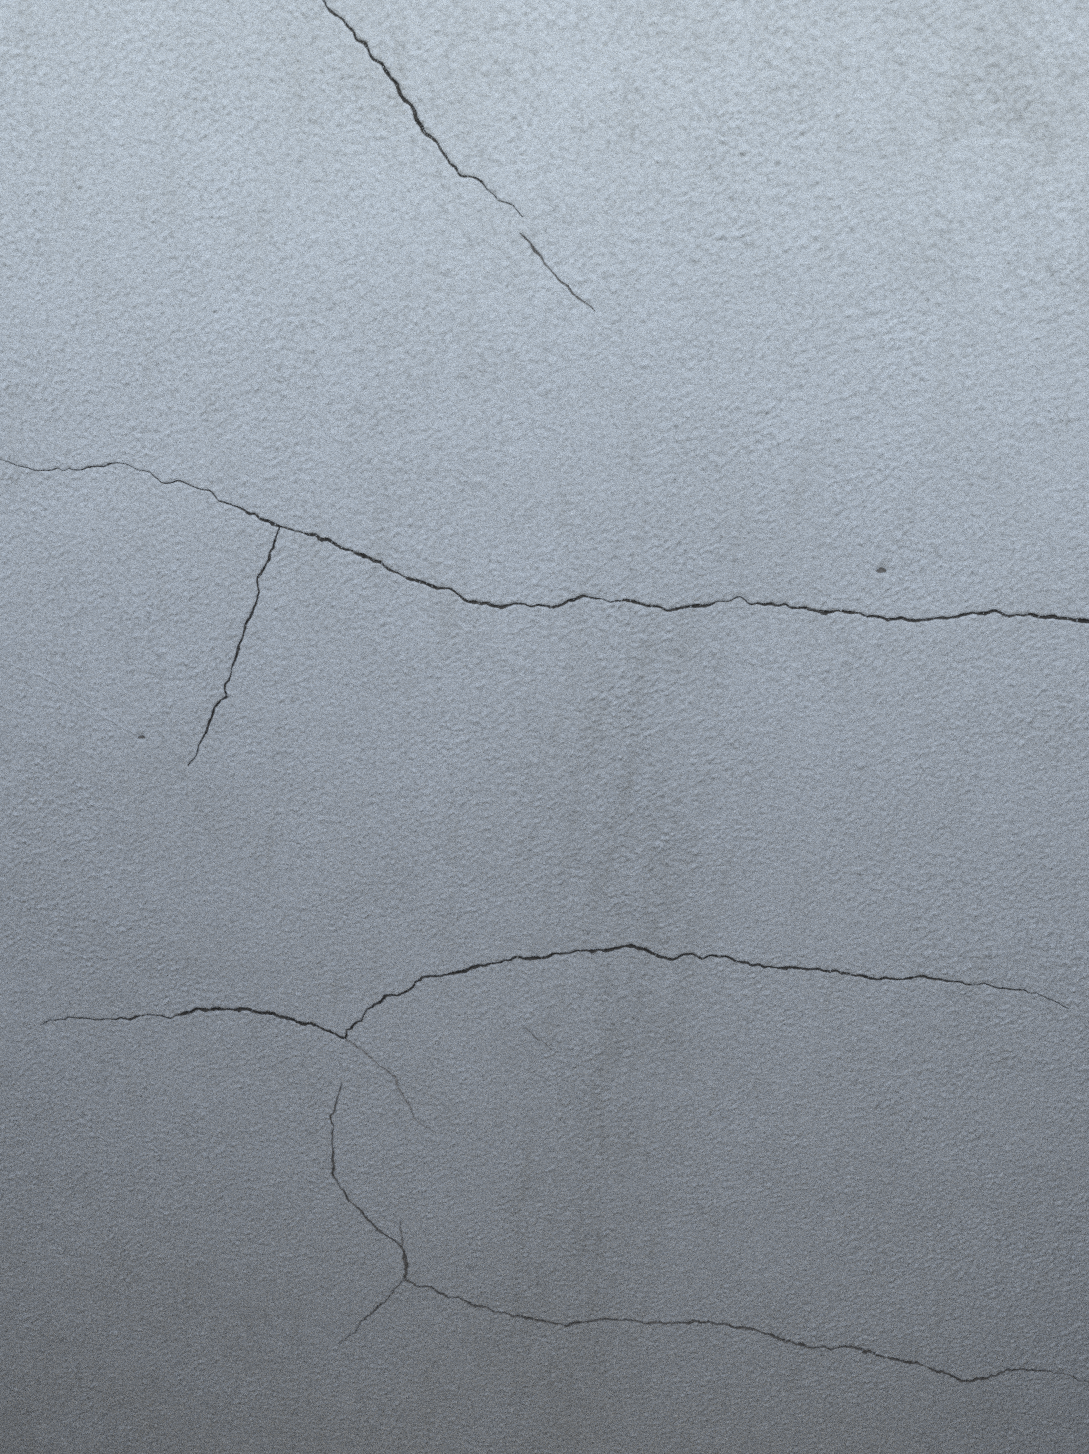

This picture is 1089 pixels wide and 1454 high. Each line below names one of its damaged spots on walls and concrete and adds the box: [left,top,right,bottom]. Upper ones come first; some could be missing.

crack [323,0,596,312]
crack [0,459,1089,766]
crack [41,944,1068,1132]
crack [330,1083,1089,1383]